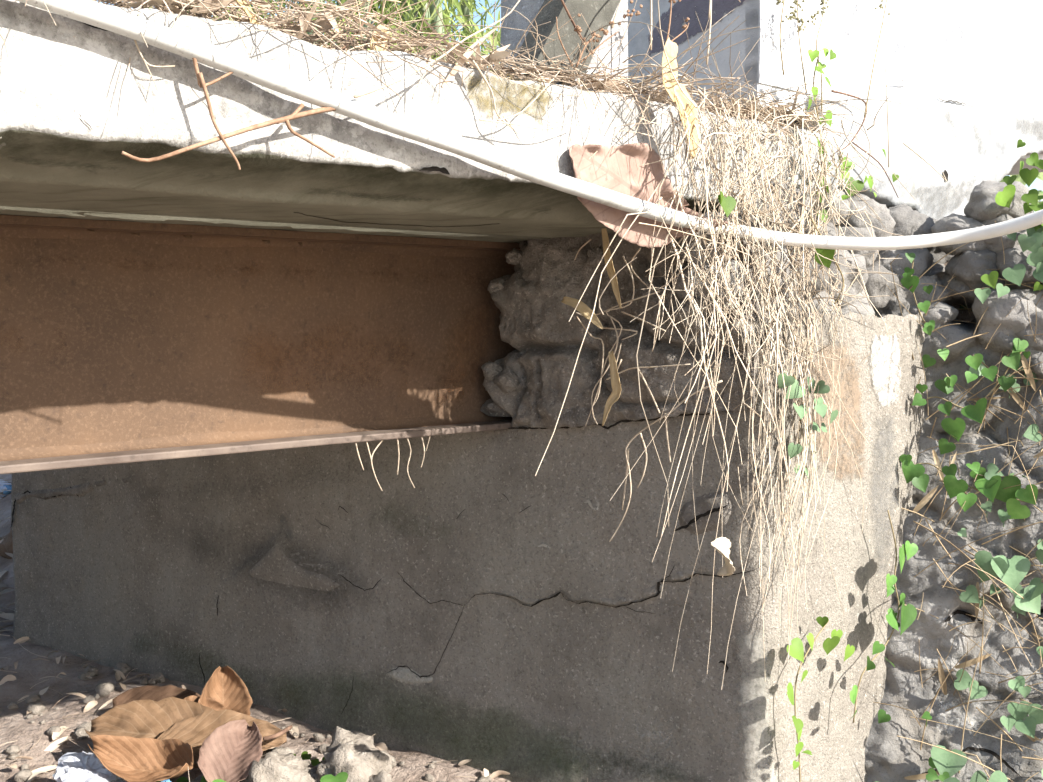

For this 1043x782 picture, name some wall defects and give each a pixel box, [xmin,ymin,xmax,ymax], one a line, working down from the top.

crack [675,505,727,531]
crack [341,563,766,676]